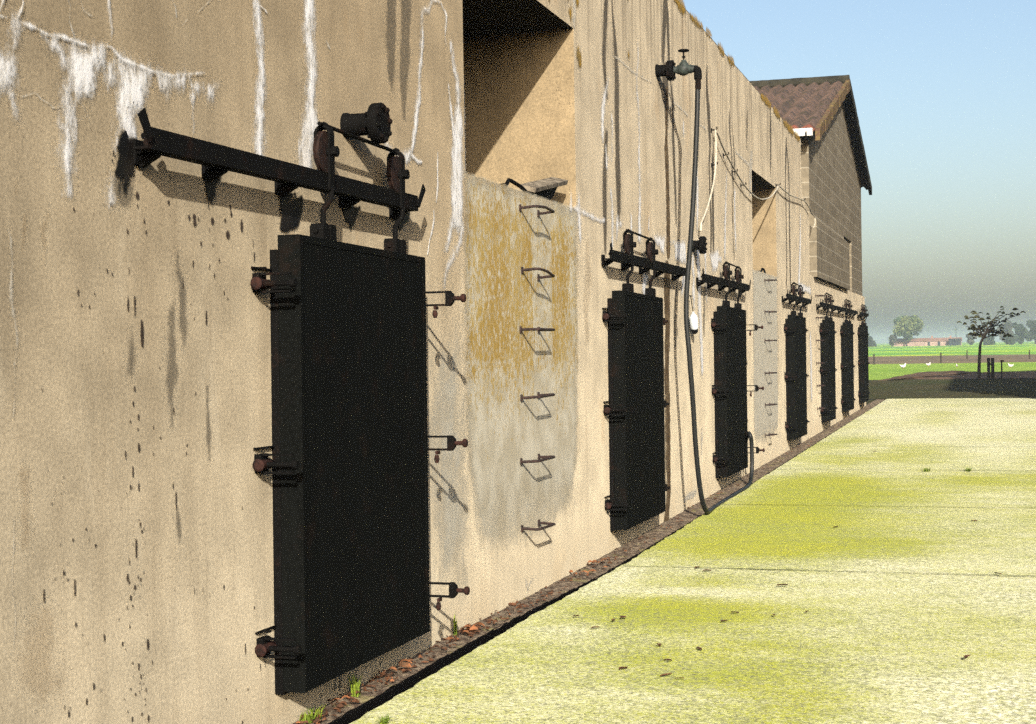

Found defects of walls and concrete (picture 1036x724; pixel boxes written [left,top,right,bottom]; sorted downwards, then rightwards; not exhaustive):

leakage [0,54,16,107]
leakage [13,19,214,211]
leakage [184,203,243,239]
leakage [253,0,267,156]
leakage [298,0,318,168]
leakage [444,42,466,286]
leakage [127,296,144,347]